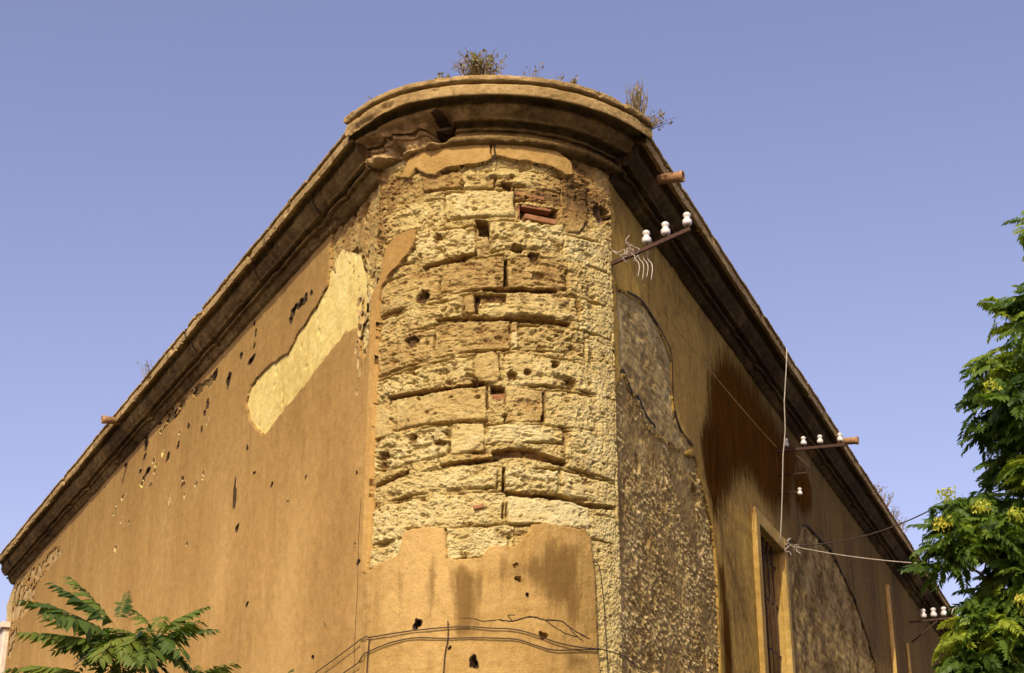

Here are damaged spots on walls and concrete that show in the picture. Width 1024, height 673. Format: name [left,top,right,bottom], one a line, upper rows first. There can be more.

peeling [139,367,232,488]
spalling [240,145,720,673]
water stain [701,348,813,521]
spalling [787,524,877,673]